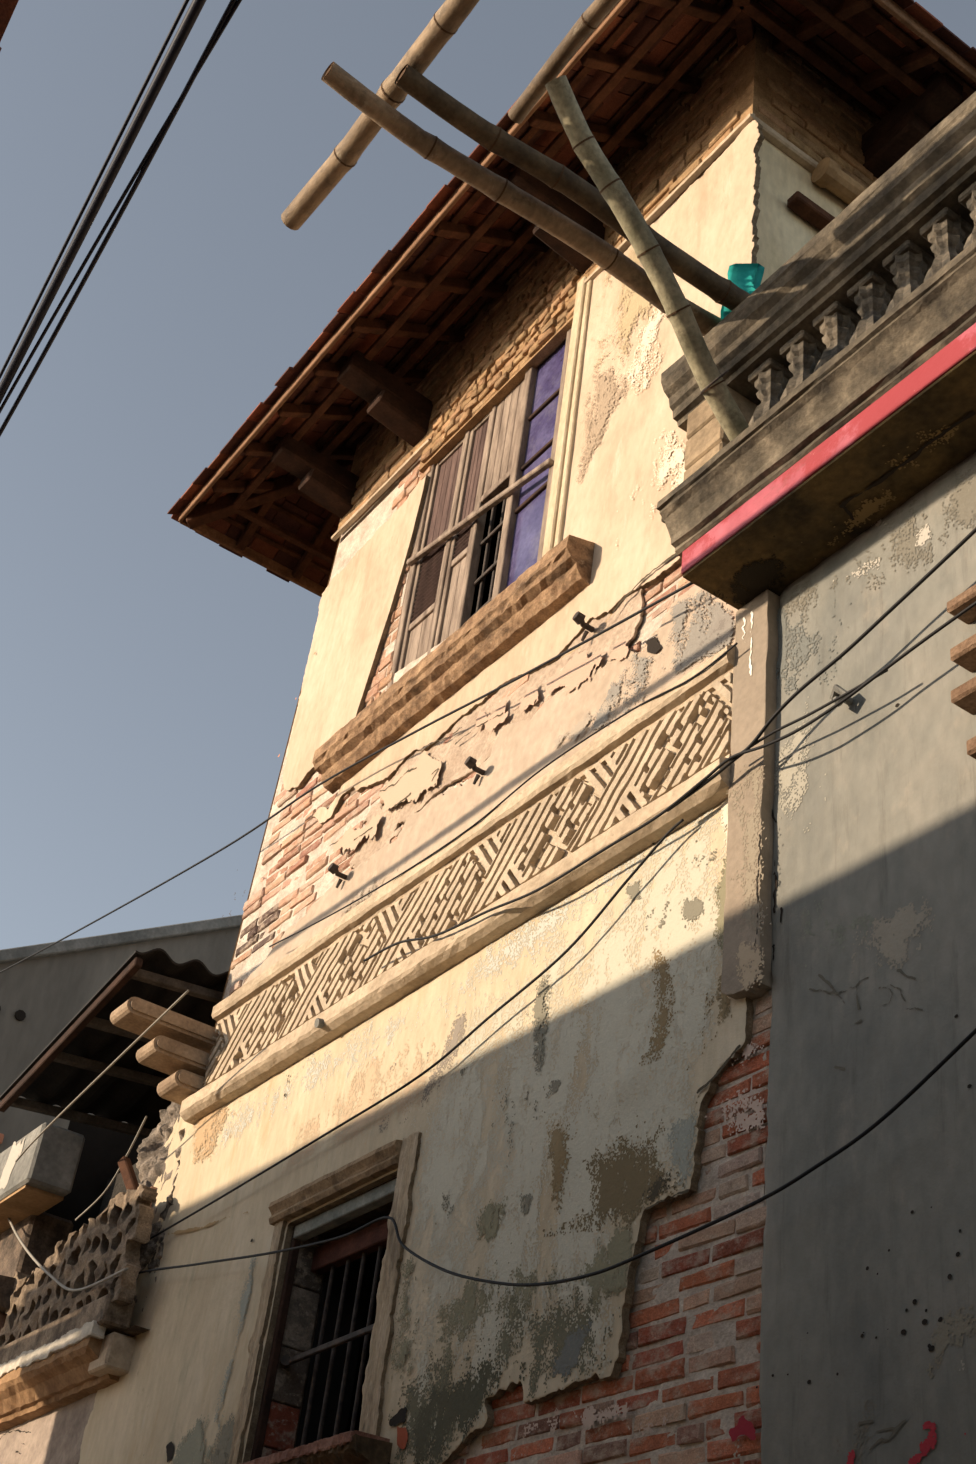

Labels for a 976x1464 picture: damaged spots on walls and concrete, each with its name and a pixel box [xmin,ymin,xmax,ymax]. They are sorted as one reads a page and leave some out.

spalling [475,565,695,734]
flaking render [229,733,453,996]
damp [387,1115,686,1464]
flaking render [450,995,789,1464]
spalling [166,1441,174,1462]
spalling [389,1407,408,1449]